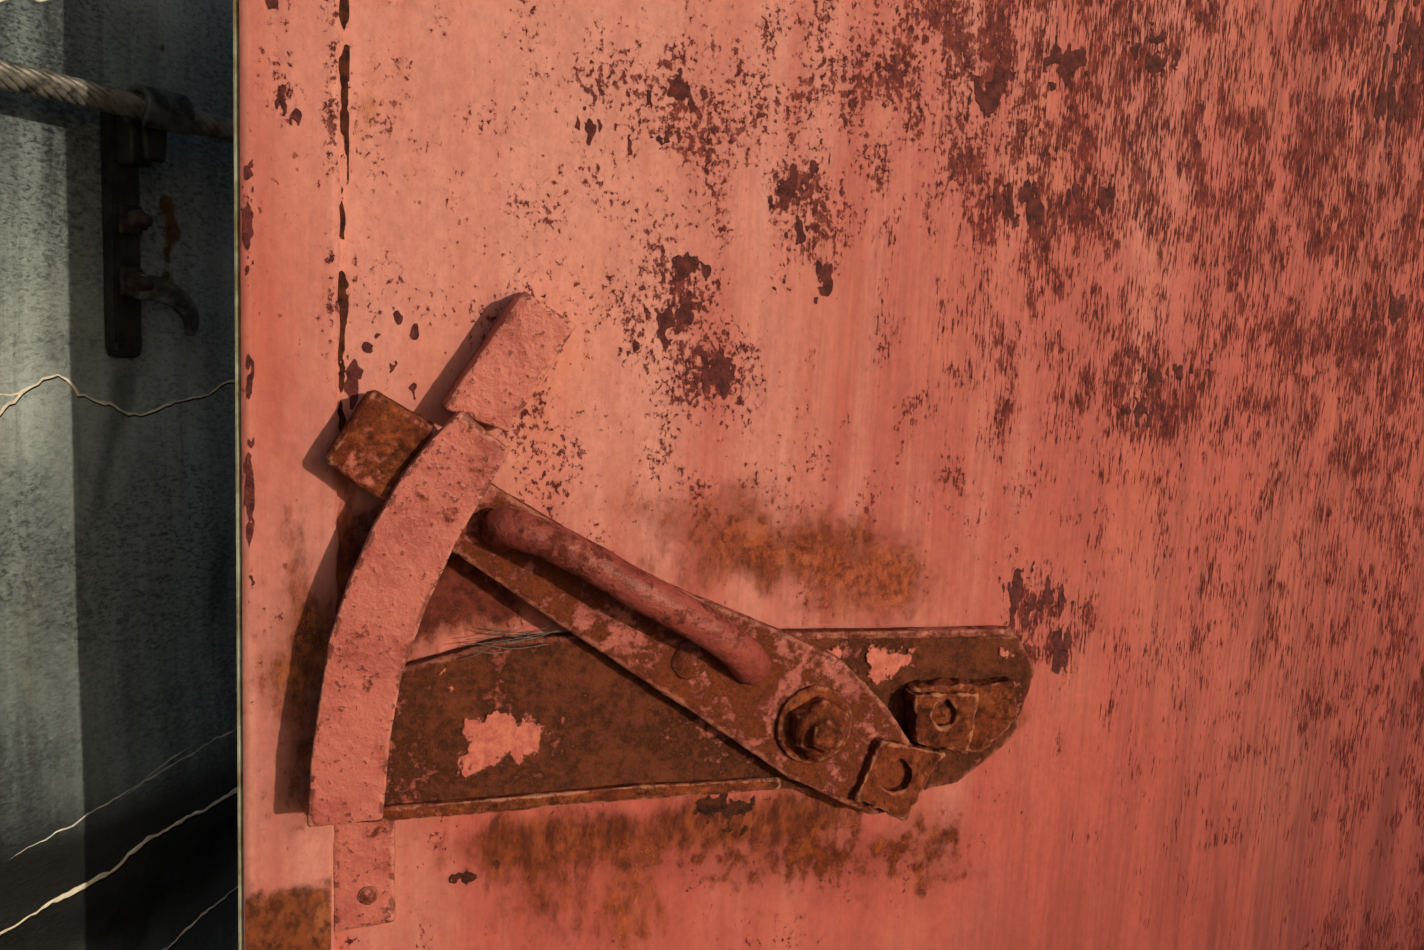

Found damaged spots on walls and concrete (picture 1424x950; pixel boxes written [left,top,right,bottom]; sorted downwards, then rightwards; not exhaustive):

crack [0,374,235,418]
rust [351,510,378,562]
rust [413,552,520,643]
rust [663,493,920,617]
rust [259,599,332,819]
crack [11,728,237,859]
crack [0,787,238,938]
crack [162,886,238,950]
rust [246,881,332,950]
rust [588,816,959,948]